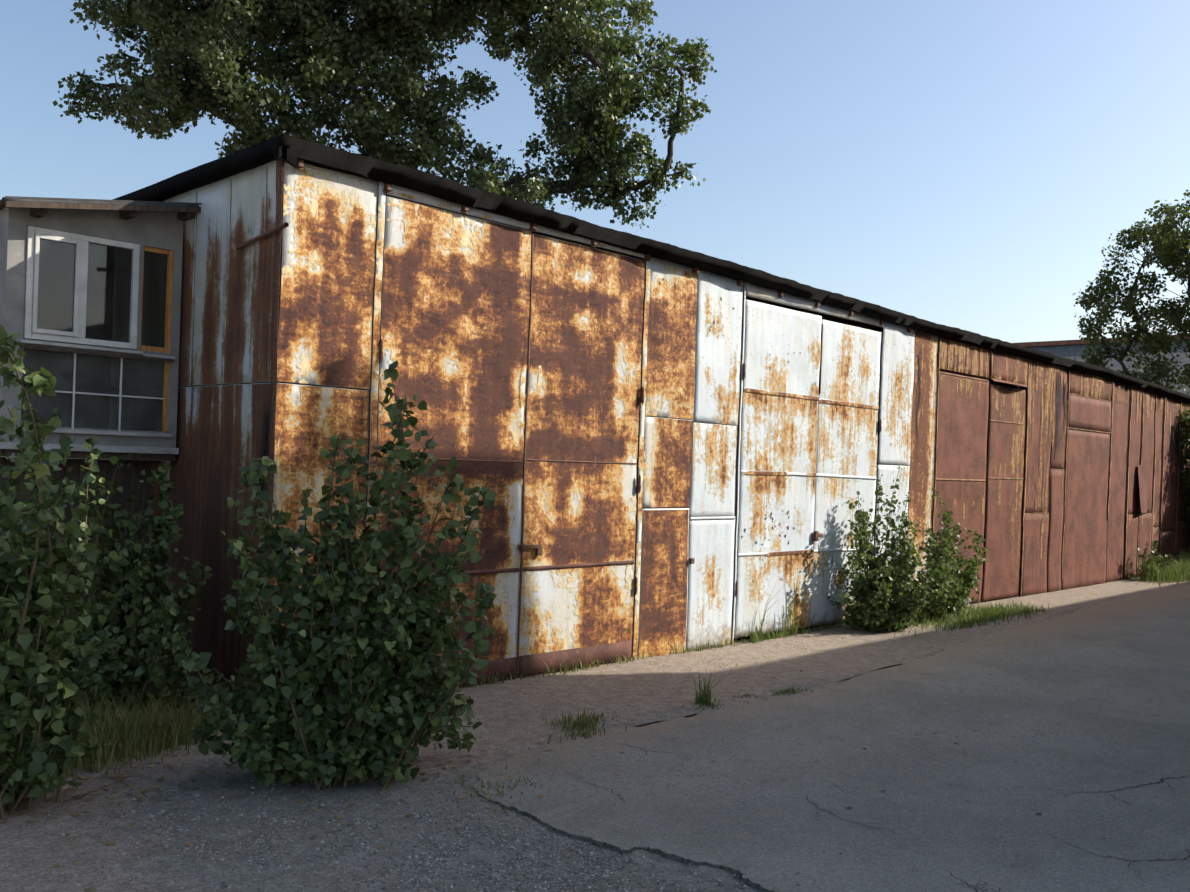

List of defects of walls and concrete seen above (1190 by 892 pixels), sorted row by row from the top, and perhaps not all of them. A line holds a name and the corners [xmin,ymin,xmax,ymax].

corrosion [166,166,1189,697]